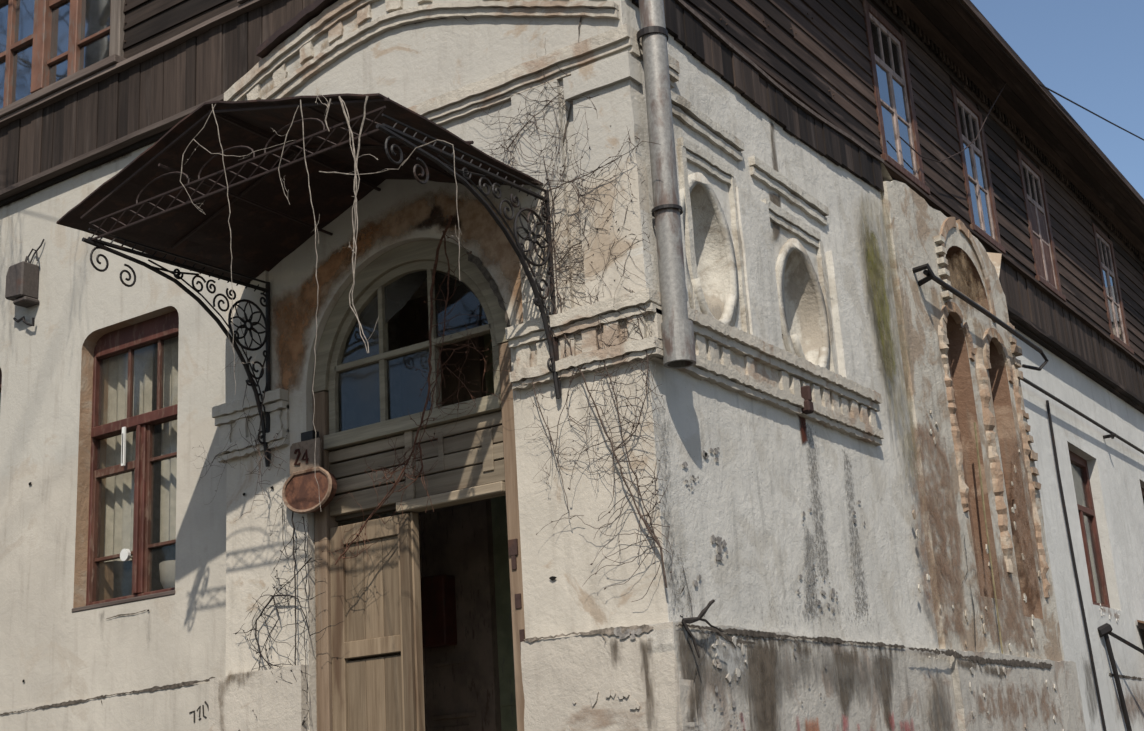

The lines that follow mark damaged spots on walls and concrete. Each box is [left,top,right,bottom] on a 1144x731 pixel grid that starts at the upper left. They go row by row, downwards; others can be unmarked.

peeling [275,193,523,390]
water stain [861,199,916,477]
peeling [711,535,728,563]
spalling [912,410,1065,731]
crack [0,677,215,715]
peeling [711,636,749,731]
water stain [679,633,893,731]
water stain [930,674,953,731]